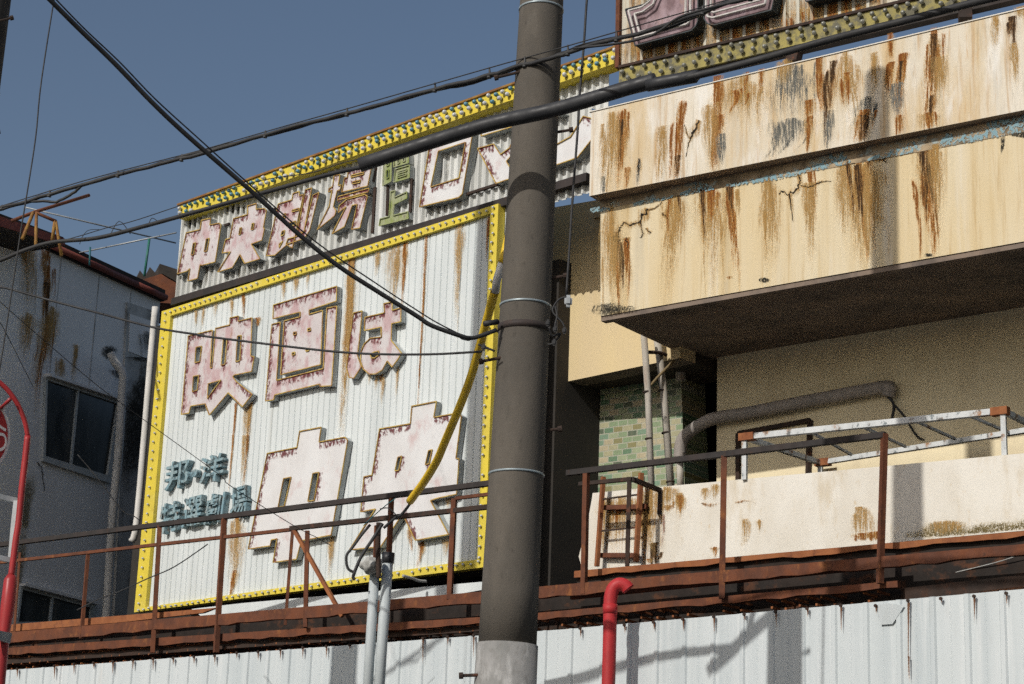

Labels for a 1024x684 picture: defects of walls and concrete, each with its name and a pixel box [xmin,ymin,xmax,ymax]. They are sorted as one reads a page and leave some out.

corrosion [656,101,687,176]
crack [684,120,701,155]
corrosion [703,69,763,166]
corrosion [804,33,908,151]
corrosion [921,28,947,129]
corrosion [992,7,1024,76]
crack [594,201,667,247]
corrosion [697,186,740,276]
crack [779,157,889,220]
corrosion [912,144,943,252]
corrosion [602,486,684,564]
water stain [908,520,1024,537]